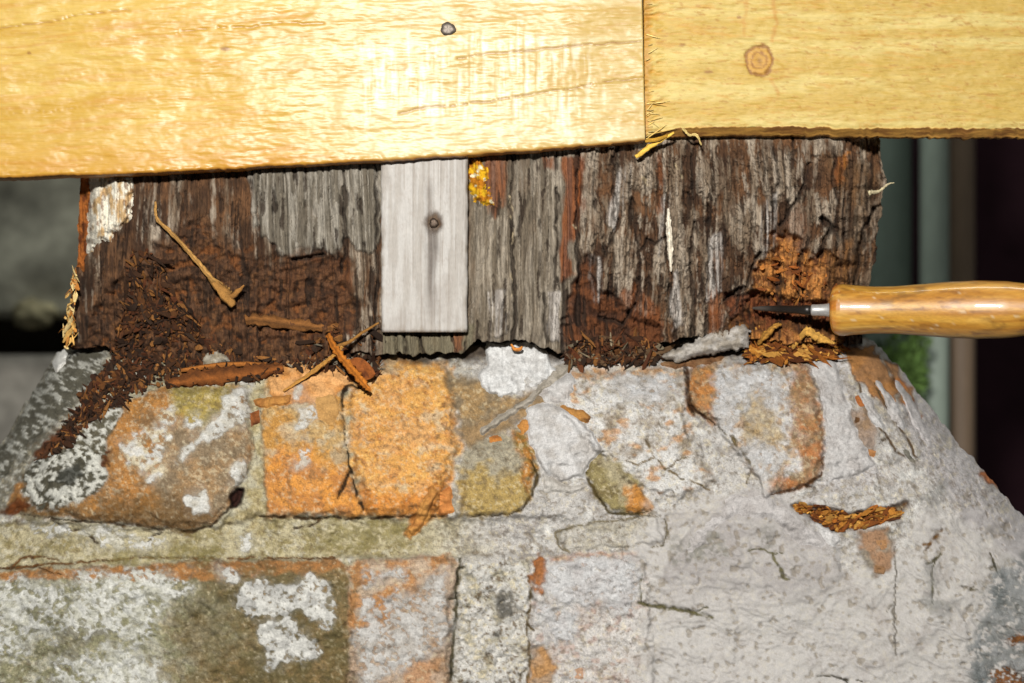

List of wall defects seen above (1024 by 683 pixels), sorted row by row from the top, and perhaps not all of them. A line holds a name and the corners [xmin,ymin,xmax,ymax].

crack [259,384,539,529]
crack [858,382,918,458]
crack [749,548,790,580]